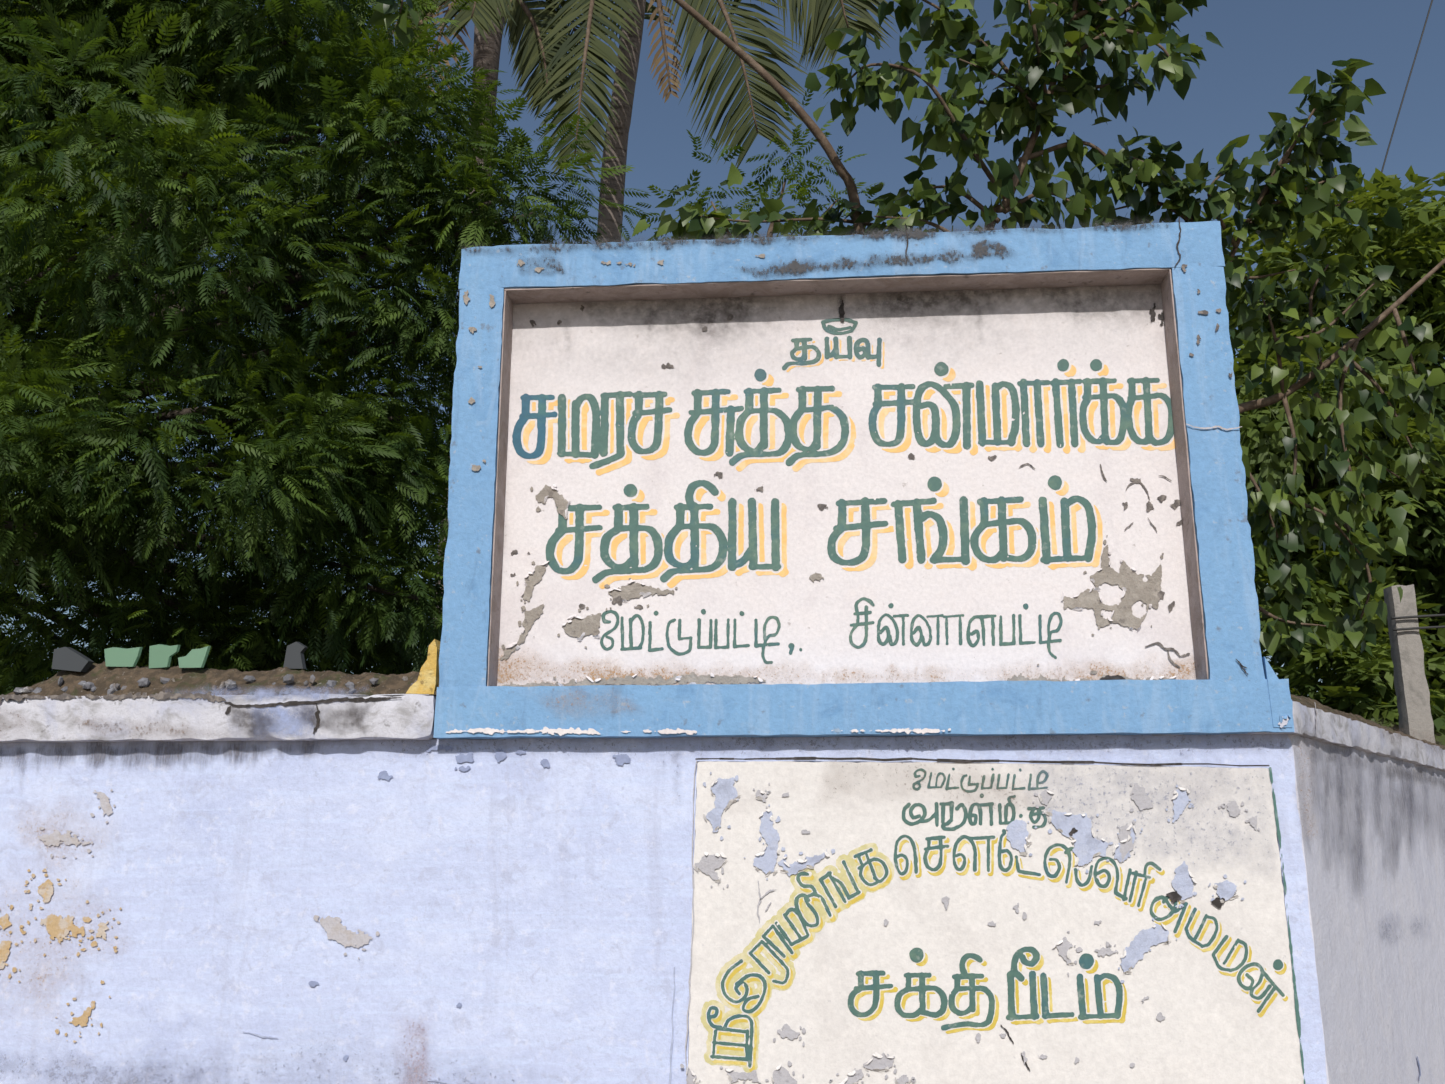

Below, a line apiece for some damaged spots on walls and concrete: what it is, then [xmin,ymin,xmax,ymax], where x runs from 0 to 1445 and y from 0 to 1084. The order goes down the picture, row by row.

peeling [530,484,577,519]
peeling [500,550,549,660]
peeling [557,578,678,649]
peeling [1061,535,1175,636]
crack [224,697,402,734]
peeling [693,772,835,889]
peeling [1006,783,1194,873]
peeling [0,827,122,983]
peeling [1166,853,1247,908]
peeling [1052,917,1177,983]
peeling [55,980,111,1043]
peeling [829,1052,916,1084]